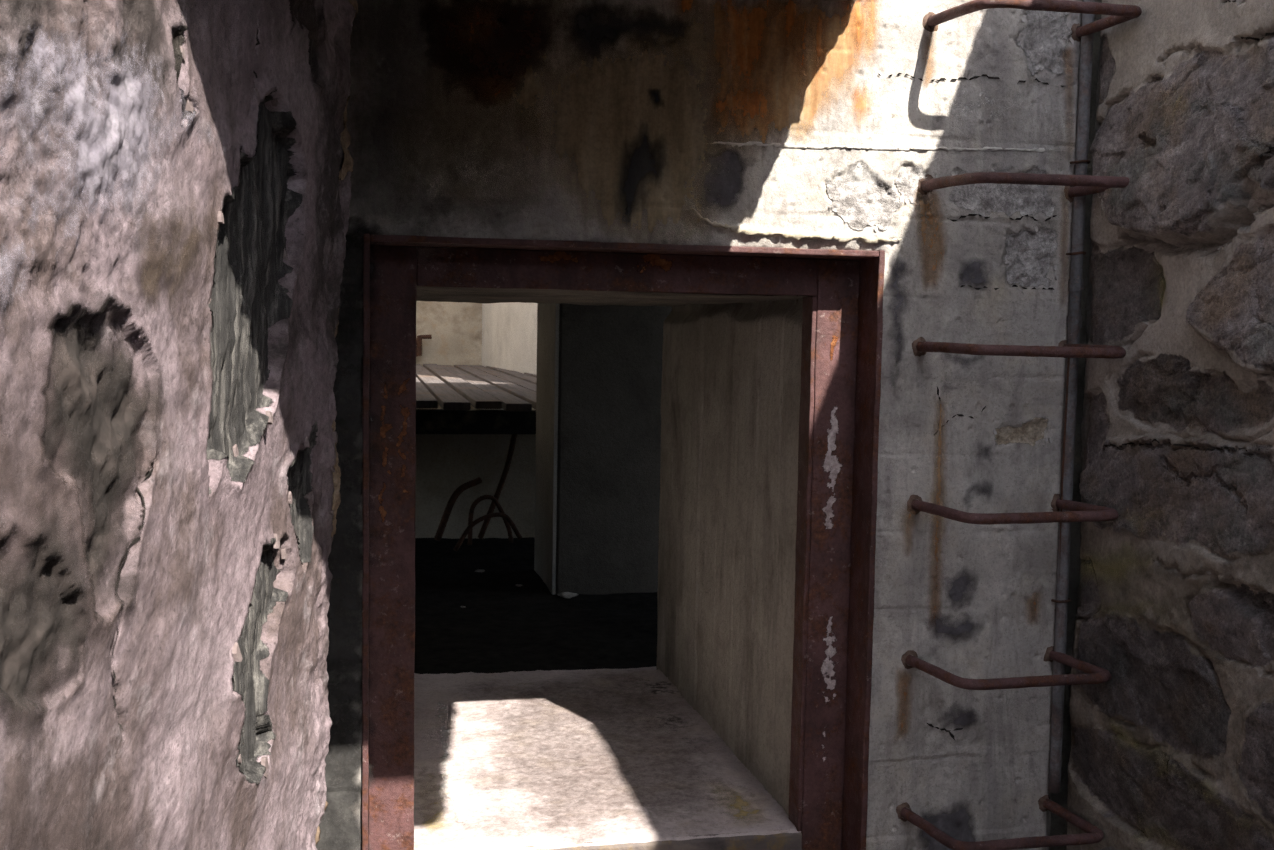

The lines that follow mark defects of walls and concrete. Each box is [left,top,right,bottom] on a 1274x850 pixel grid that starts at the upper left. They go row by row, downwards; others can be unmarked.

damp [422,0,901,243]
rust [712,0,875,147]
flaking render [206,88,302,482]
damp [889,258,907,366]
damp [0,310,162,719]
peeling [822,407,842,529]
flaking render [232,420,341,784]
peeling [821,617,837,702]
damp [918,804,976,850]